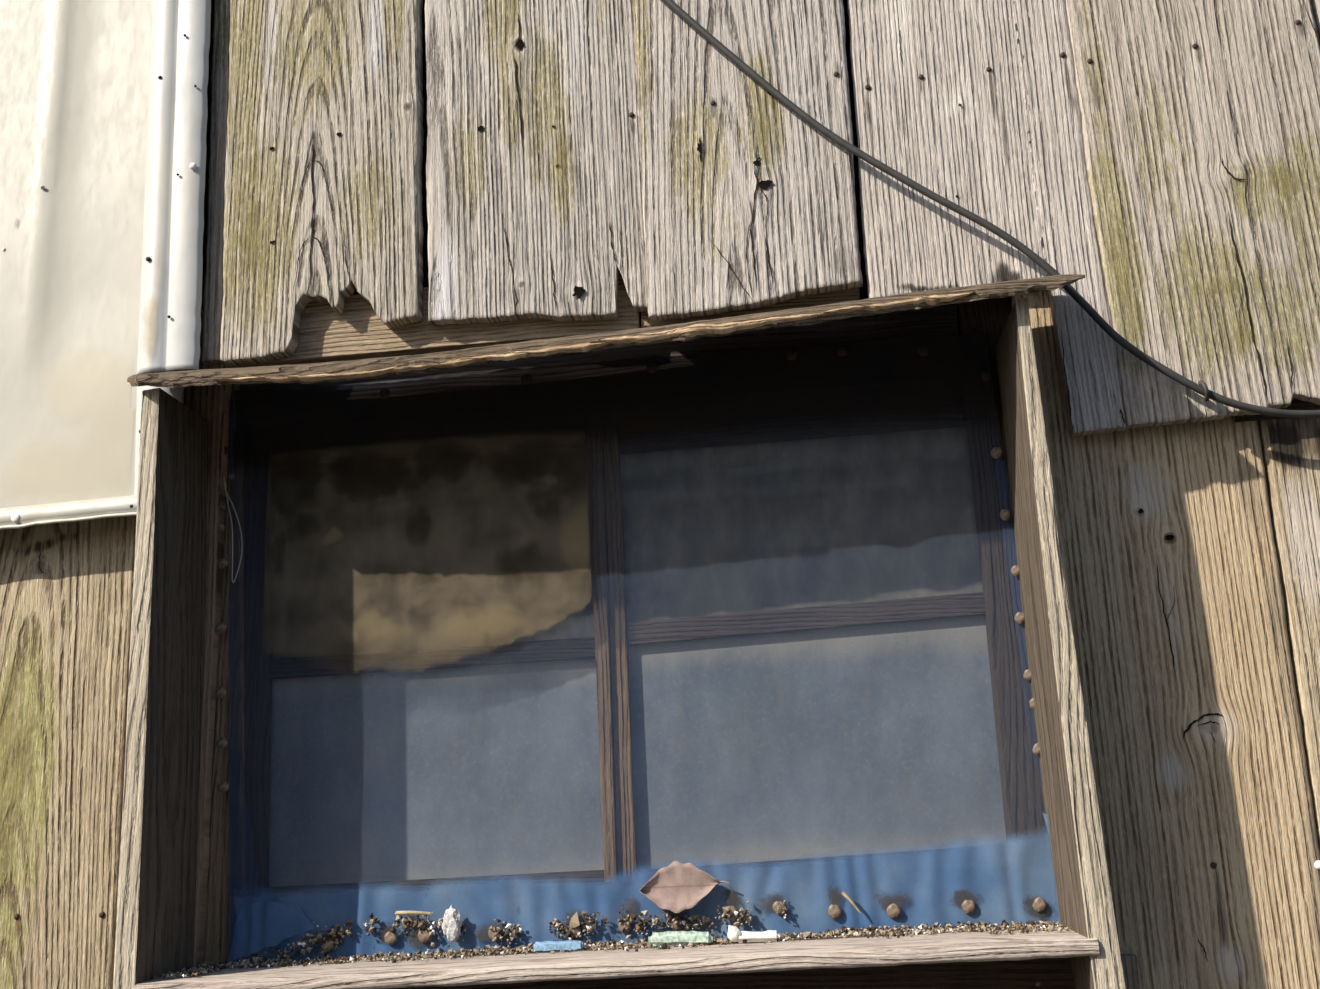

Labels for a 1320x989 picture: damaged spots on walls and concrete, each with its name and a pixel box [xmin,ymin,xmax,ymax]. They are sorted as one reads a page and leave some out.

crack [292,127,349,298]
crack [708,157,774,300]